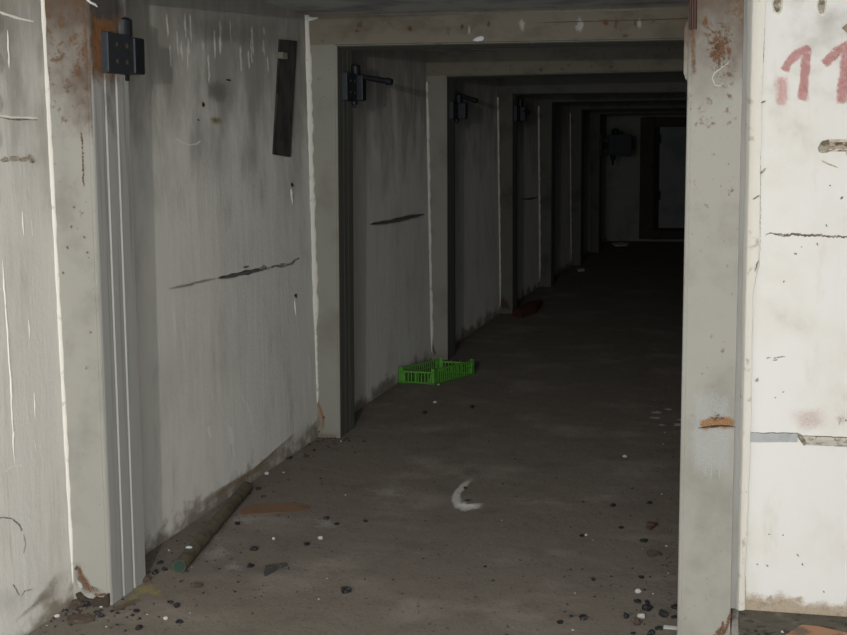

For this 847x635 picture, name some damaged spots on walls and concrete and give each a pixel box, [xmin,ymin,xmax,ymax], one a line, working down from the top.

rust [72,0,121,87]
rust [690,16,733,79]
crack [370,214,425,226]
crack [753,156,847,286]
crack [168,258,299,290]
spalling [75,592,110,608]
leakage [745,574,847,617]